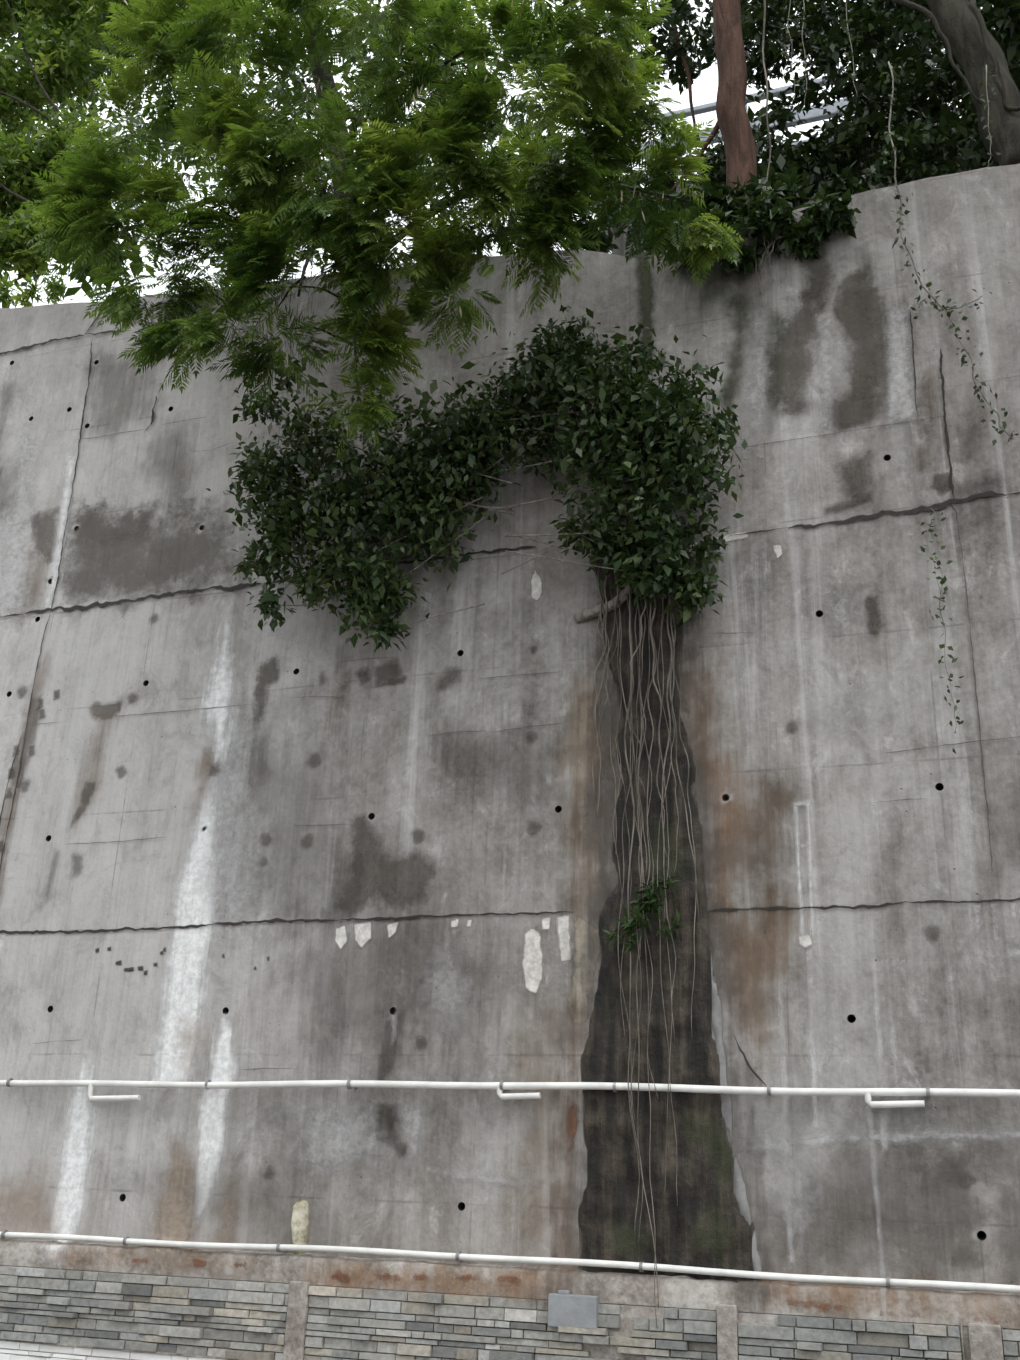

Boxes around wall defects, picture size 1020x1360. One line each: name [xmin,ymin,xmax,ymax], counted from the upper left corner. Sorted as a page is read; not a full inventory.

water stain [722,239,917,444]
water stain [825,451,871,512]
water stain [358,662,406,686]
water stain [440,668,459,689]
water stain [338,816,434,910]
spalling [335,923,371,949]
spalling [387,923,398,938]
spalling [522,915,599,1025]
rust [327,1269,472,1290]